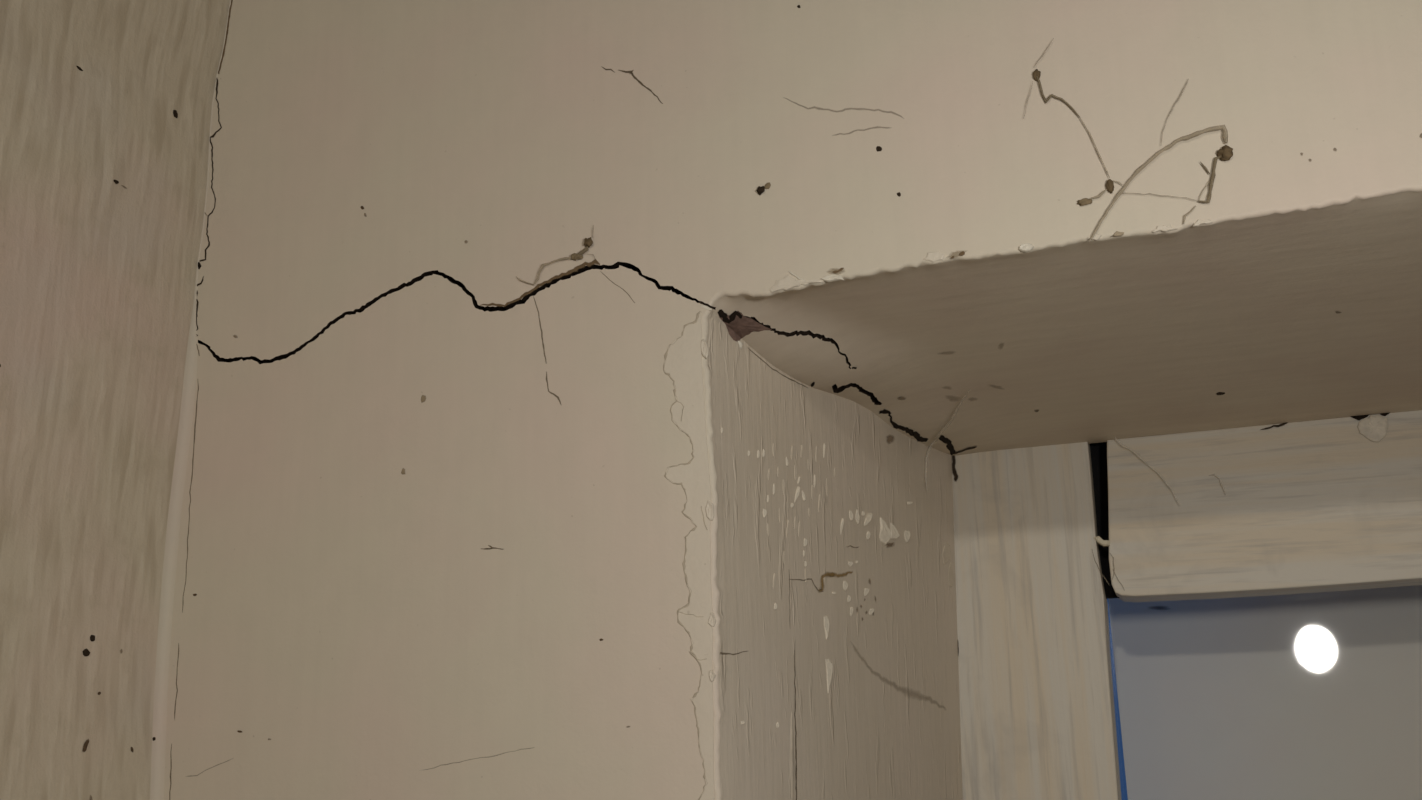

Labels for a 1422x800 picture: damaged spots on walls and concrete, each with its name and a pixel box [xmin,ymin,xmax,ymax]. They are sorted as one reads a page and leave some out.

crack [169,0,977,800]
peeling [748,443,836,609]
peeling [832,509,910,621]